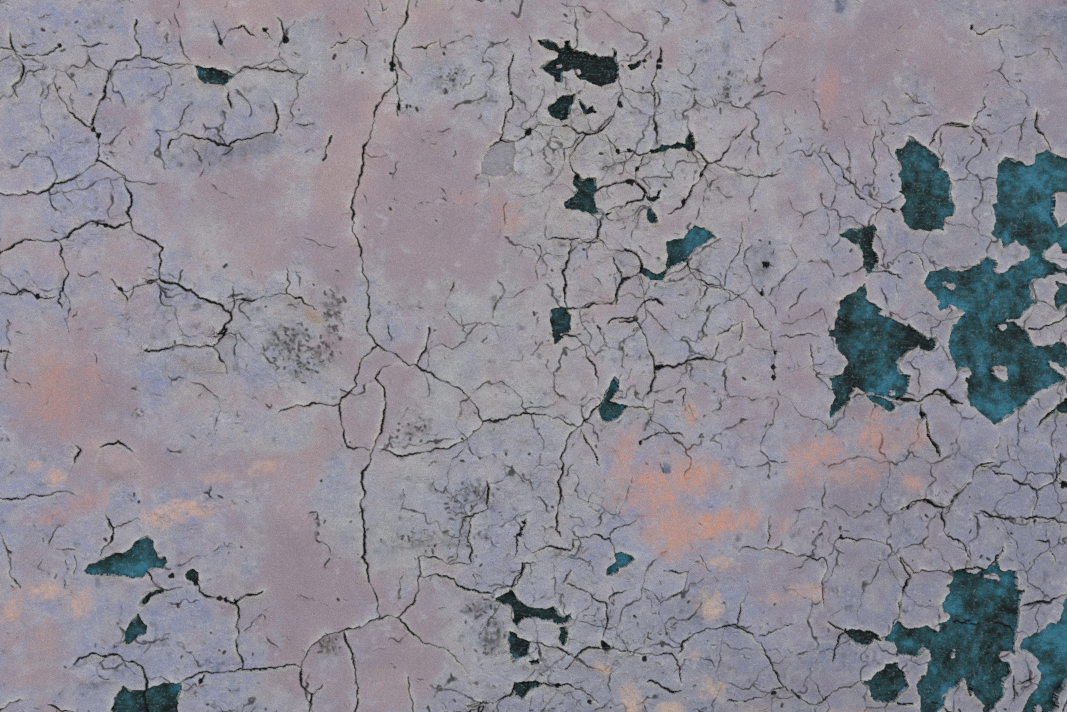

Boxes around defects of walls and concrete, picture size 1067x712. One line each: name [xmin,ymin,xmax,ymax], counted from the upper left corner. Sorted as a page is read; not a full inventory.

peeling [529,33,649,125]
crack [0,20,317,372]
peeling [894,134,958,235]
peeling [827,150,1067,425]
crack [146,0,864,712]
crack [74,440,132,463]
crack [895,388,963,457]
crack [74,652,149,712]
peeling [84,535,167,644]
peeling [493,580,577,667]
crack [738,455,1067,662]
peeling [844,561,1067,712]